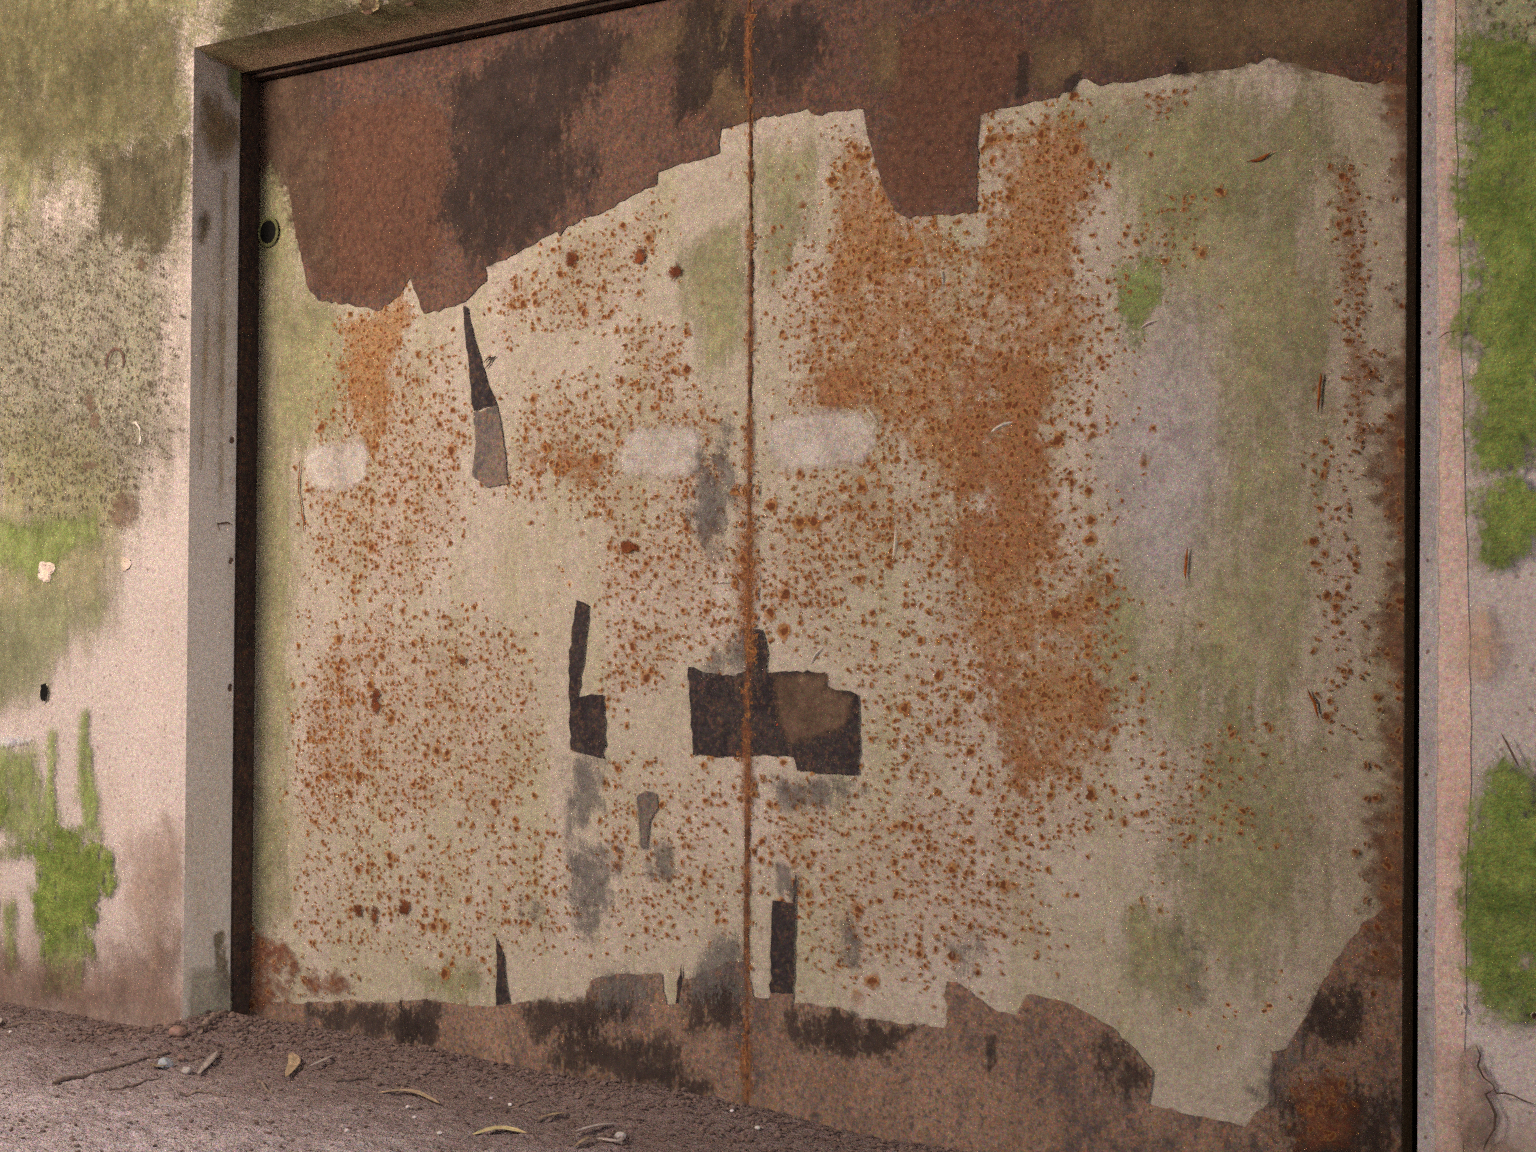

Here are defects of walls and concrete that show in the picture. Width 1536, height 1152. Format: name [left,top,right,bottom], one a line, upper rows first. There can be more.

rust [743,0,758,187]
peeling [259,0,1407,487]
rust [1145,84,1195,121]
leakage [0,92,240,706]
peeling [568,600,606,758]
rust [249,92,1291,1105]
peeling [687,629,860,775]
peeling [250,862,1403,1152]